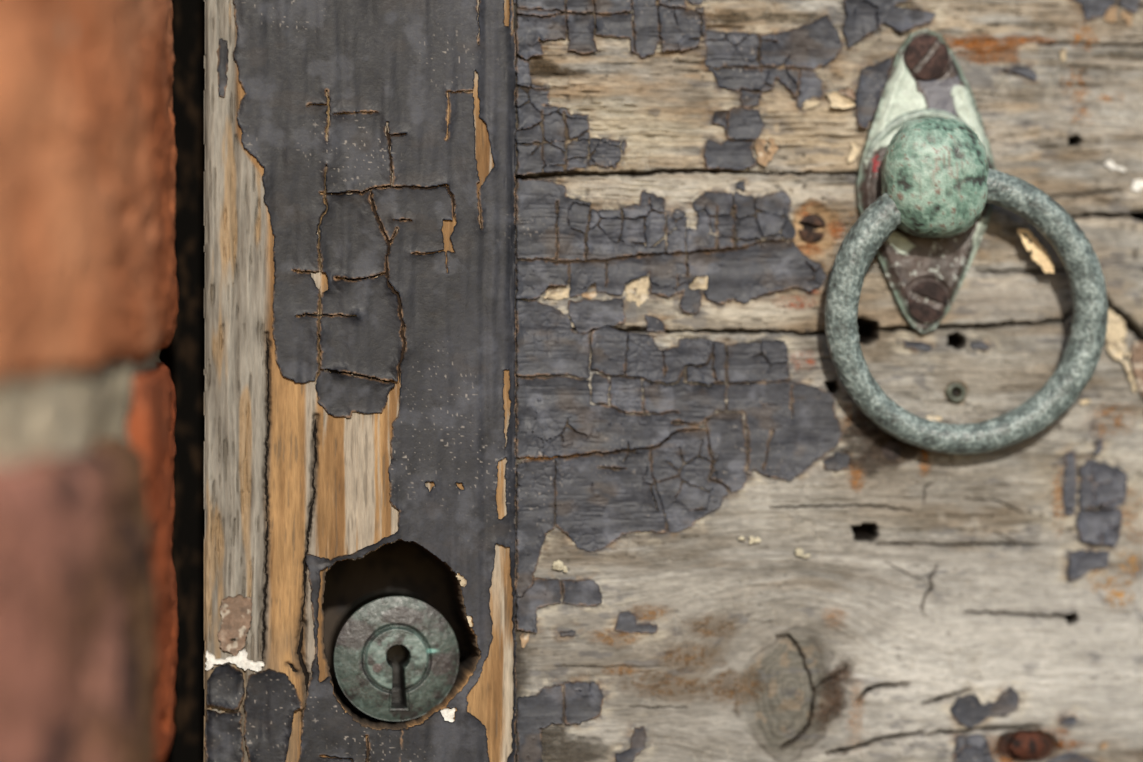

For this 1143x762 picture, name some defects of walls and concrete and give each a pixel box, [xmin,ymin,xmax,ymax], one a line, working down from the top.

crack [295,92,455,384]
peeling [204,0,936,762]
crack [968,610,1065,618]
crack [779,634,843,746]
crack [861,684,904,698]
crack [928,689,967,702]
peeling [950,687,1019,762]
peeling [1060,715,1078,725]
crack [828,725,1035,753]
peeling [1048,752,1095,762]